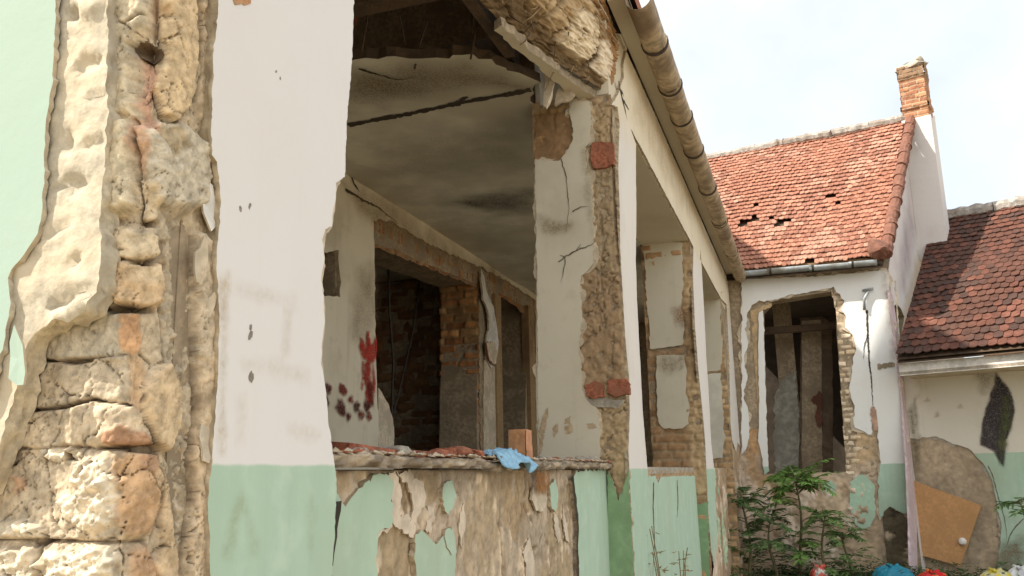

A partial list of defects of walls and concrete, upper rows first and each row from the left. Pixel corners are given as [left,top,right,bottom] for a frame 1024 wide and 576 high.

crack [347,88,532,127]
flaking render [0,0,217,576]
flaking render [332,0,631,576]
crack [558,159,592,279]
flaking render [641,241,887,576]
crack [863,281,900,403]
mould [978,374,1014,466]
flaking render [910,437,1000,576]